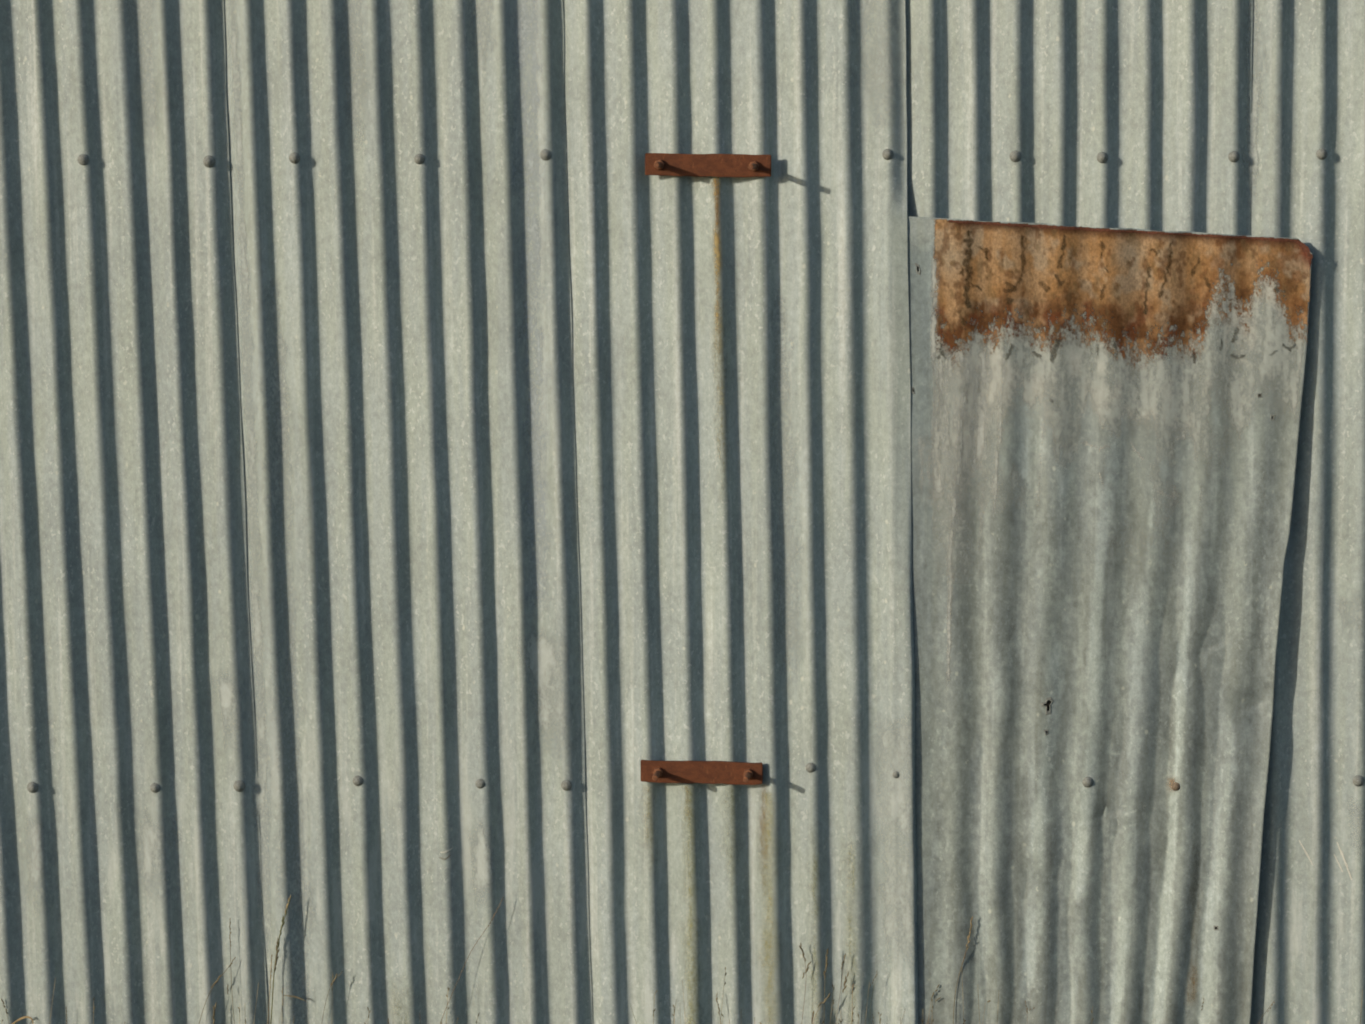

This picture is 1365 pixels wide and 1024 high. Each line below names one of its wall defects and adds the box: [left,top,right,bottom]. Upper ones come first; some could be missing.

corrosion [933,219,1313,366]